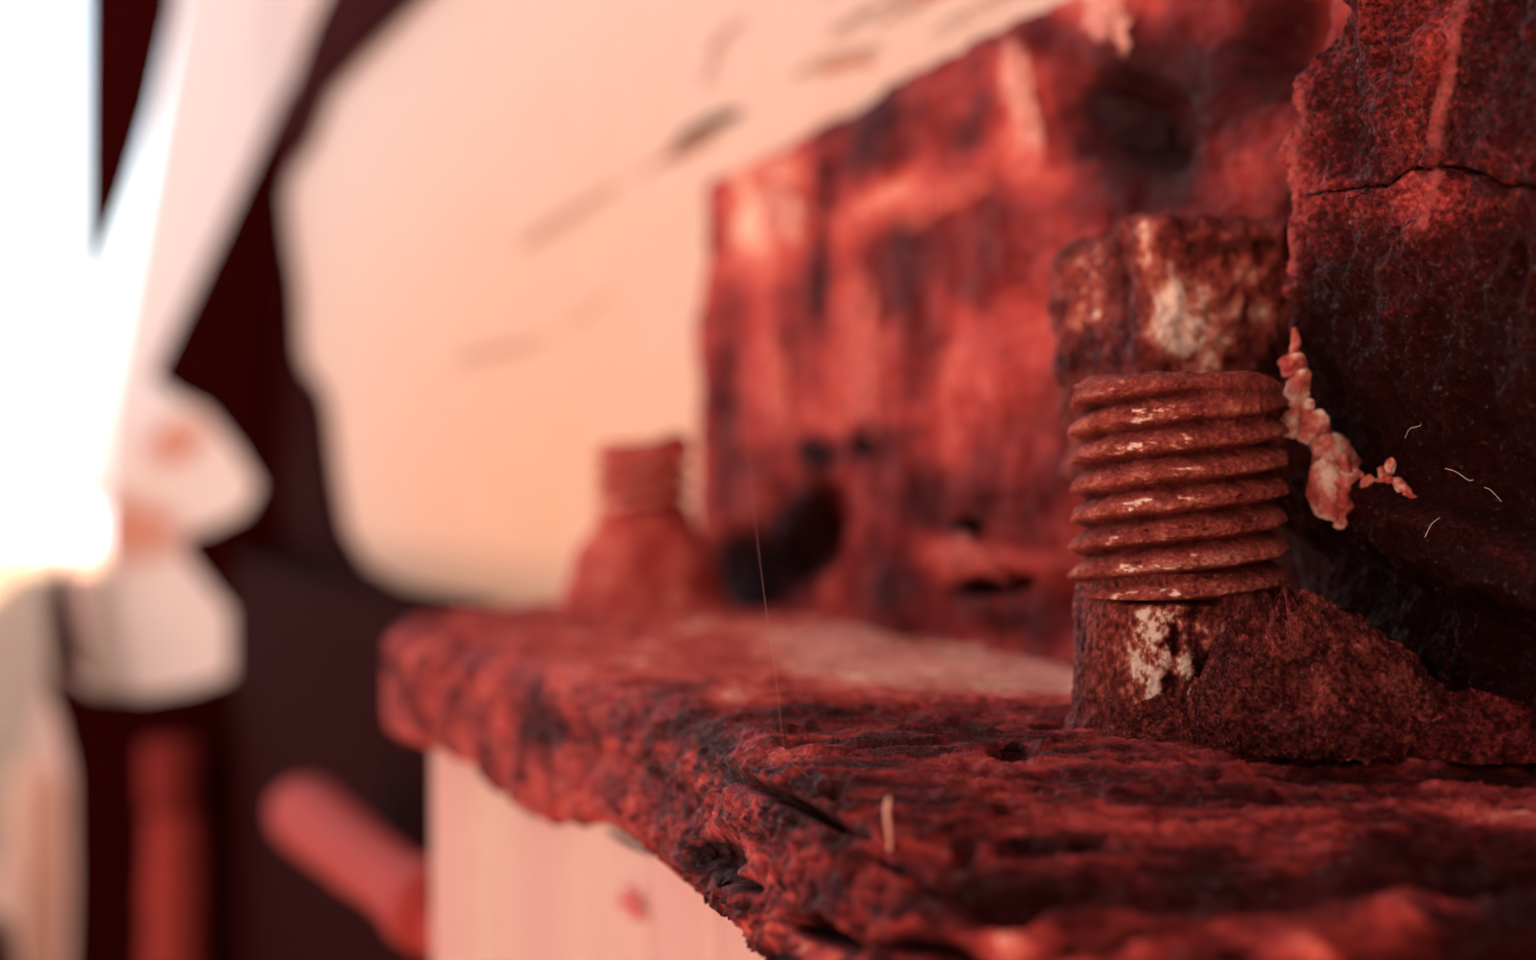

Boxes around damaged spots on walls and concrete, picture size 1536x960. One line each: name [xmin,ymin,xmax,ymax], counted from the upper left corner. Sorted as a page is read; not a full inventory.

crack [1305,165,1536,199]